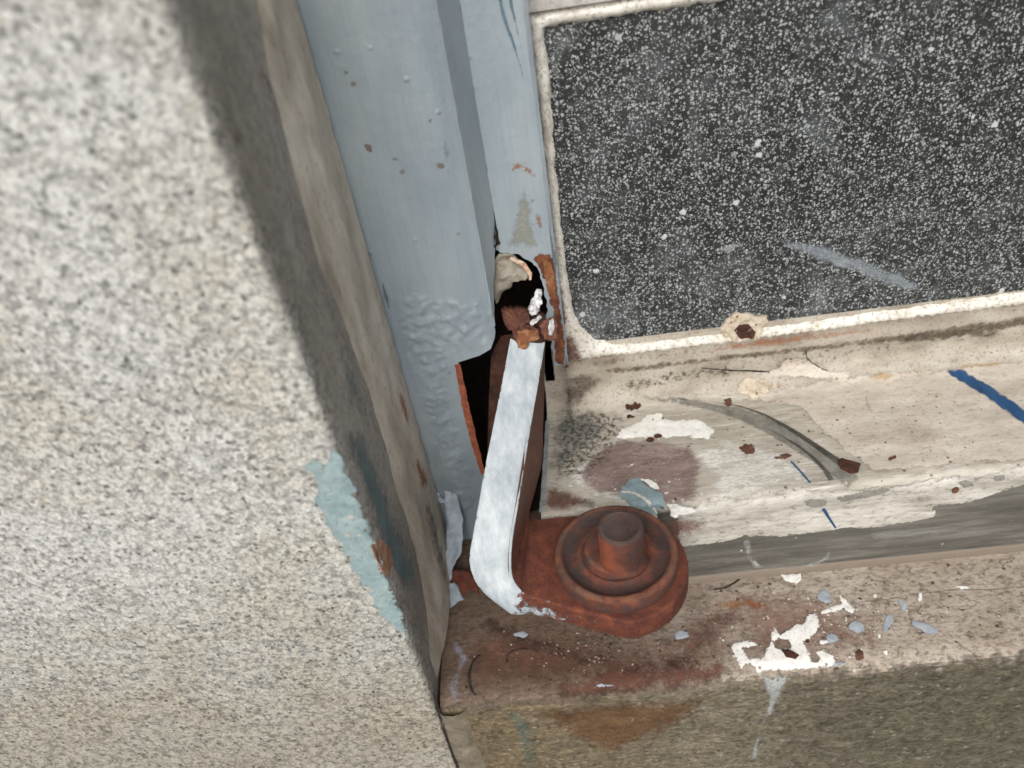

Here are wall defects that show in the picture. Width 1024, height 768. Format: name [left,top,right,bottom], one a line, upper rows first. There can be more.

peeling [614,413,714,442]
corrosion [667,520,704,536]
spalling [370,540,393,576]
corrosion [449,569,481,608]
peeling [731,595,855,674]